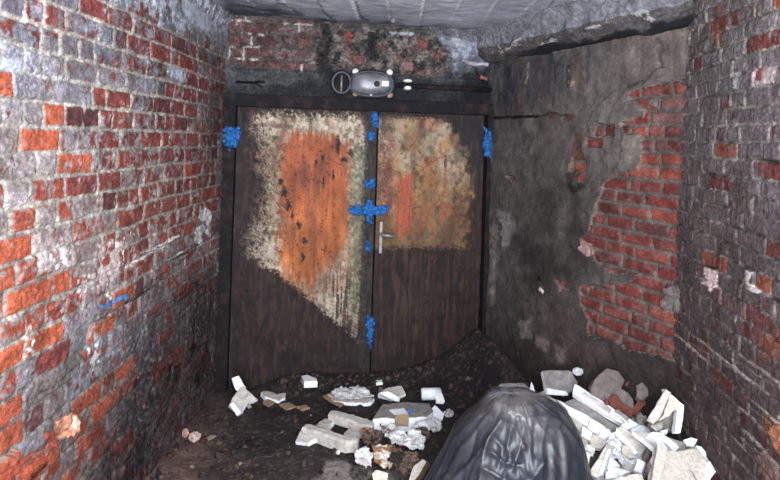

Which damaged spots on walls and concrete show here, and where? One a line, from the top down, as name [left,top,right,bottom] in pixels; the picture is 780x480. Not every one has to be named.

water stain [194,209,212,246]
flaking render [553,78,687,364]
water stain [42,243,72,272]
water stain [77,235,179,300]
water stain [87,327,99,373]